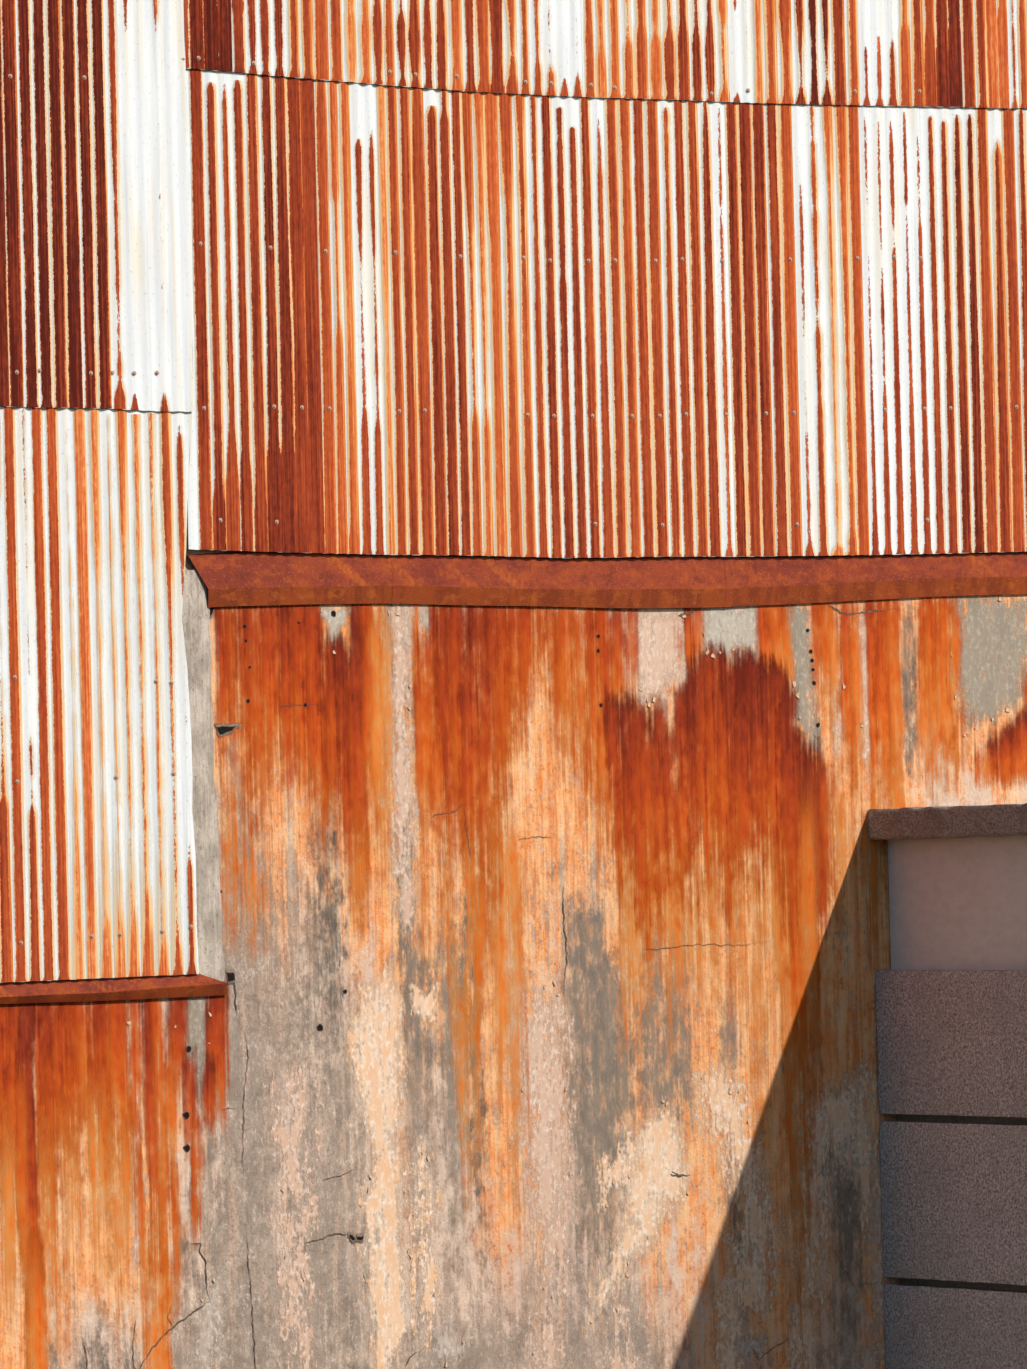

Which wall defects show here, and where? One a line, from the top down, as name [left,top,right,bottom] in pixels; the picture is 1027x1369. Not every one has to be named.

rust [0,0,1027,982]
rust [0,995,229,1369]
crack [133,1243,209,1369]
rust [413,596,1027,1236]